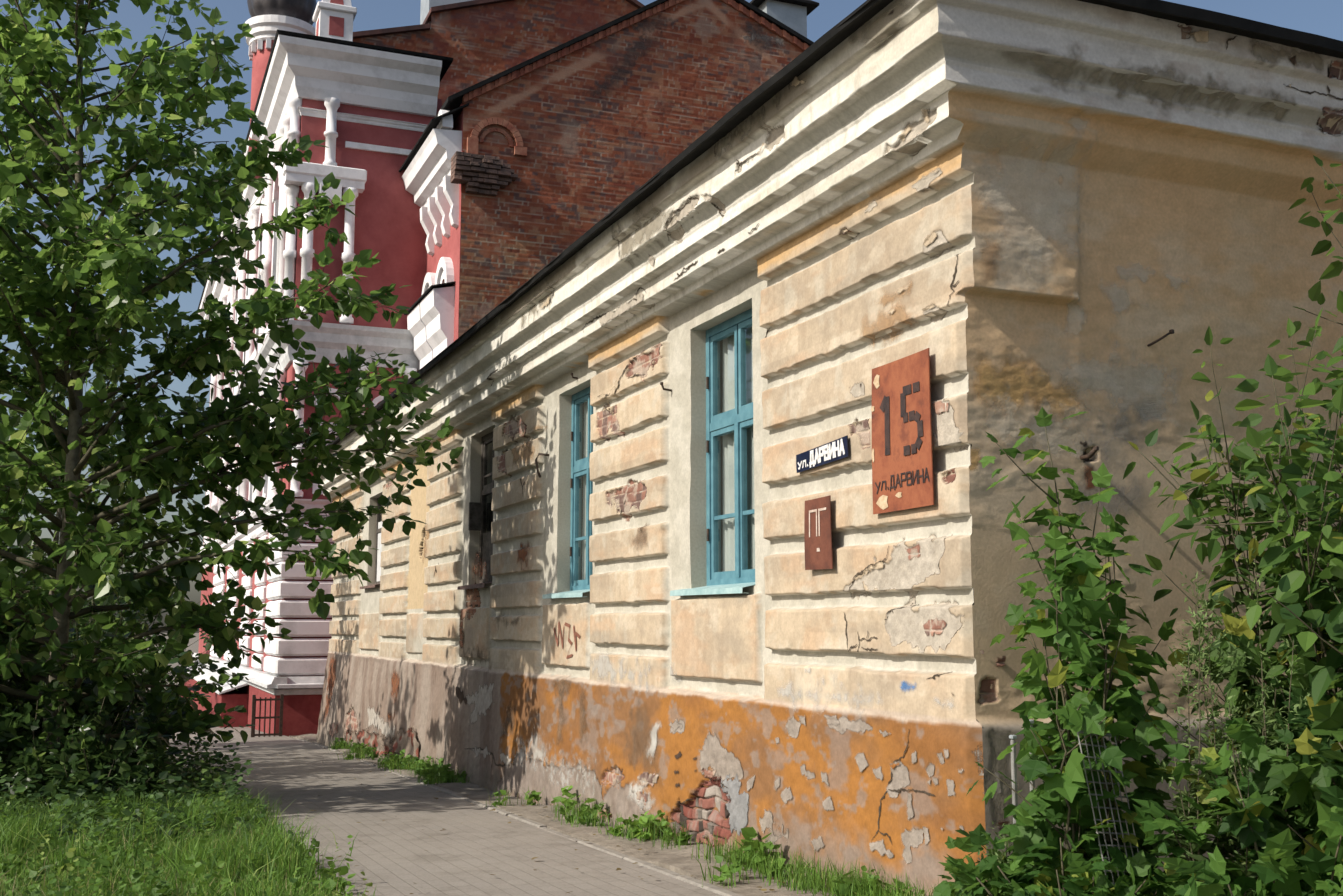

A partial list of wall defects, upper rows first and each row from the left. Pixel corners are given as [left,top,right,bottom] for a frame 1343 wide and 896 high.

peeling [885,109,937,156]
crack [1287,85,1343,100]
flaking render [1317,107,1343,136]
crack [947,253,961,312]
flaking render [597,343,662,441]
flaking render [606,479,647,522]
flaking render [843,534,964,653]
crack [844,603,919,652]
flaking render [329,704,420,759]
flaking render [669,731,788,852]
crack [872,732,935,844]
peeling [855,750,963,864]